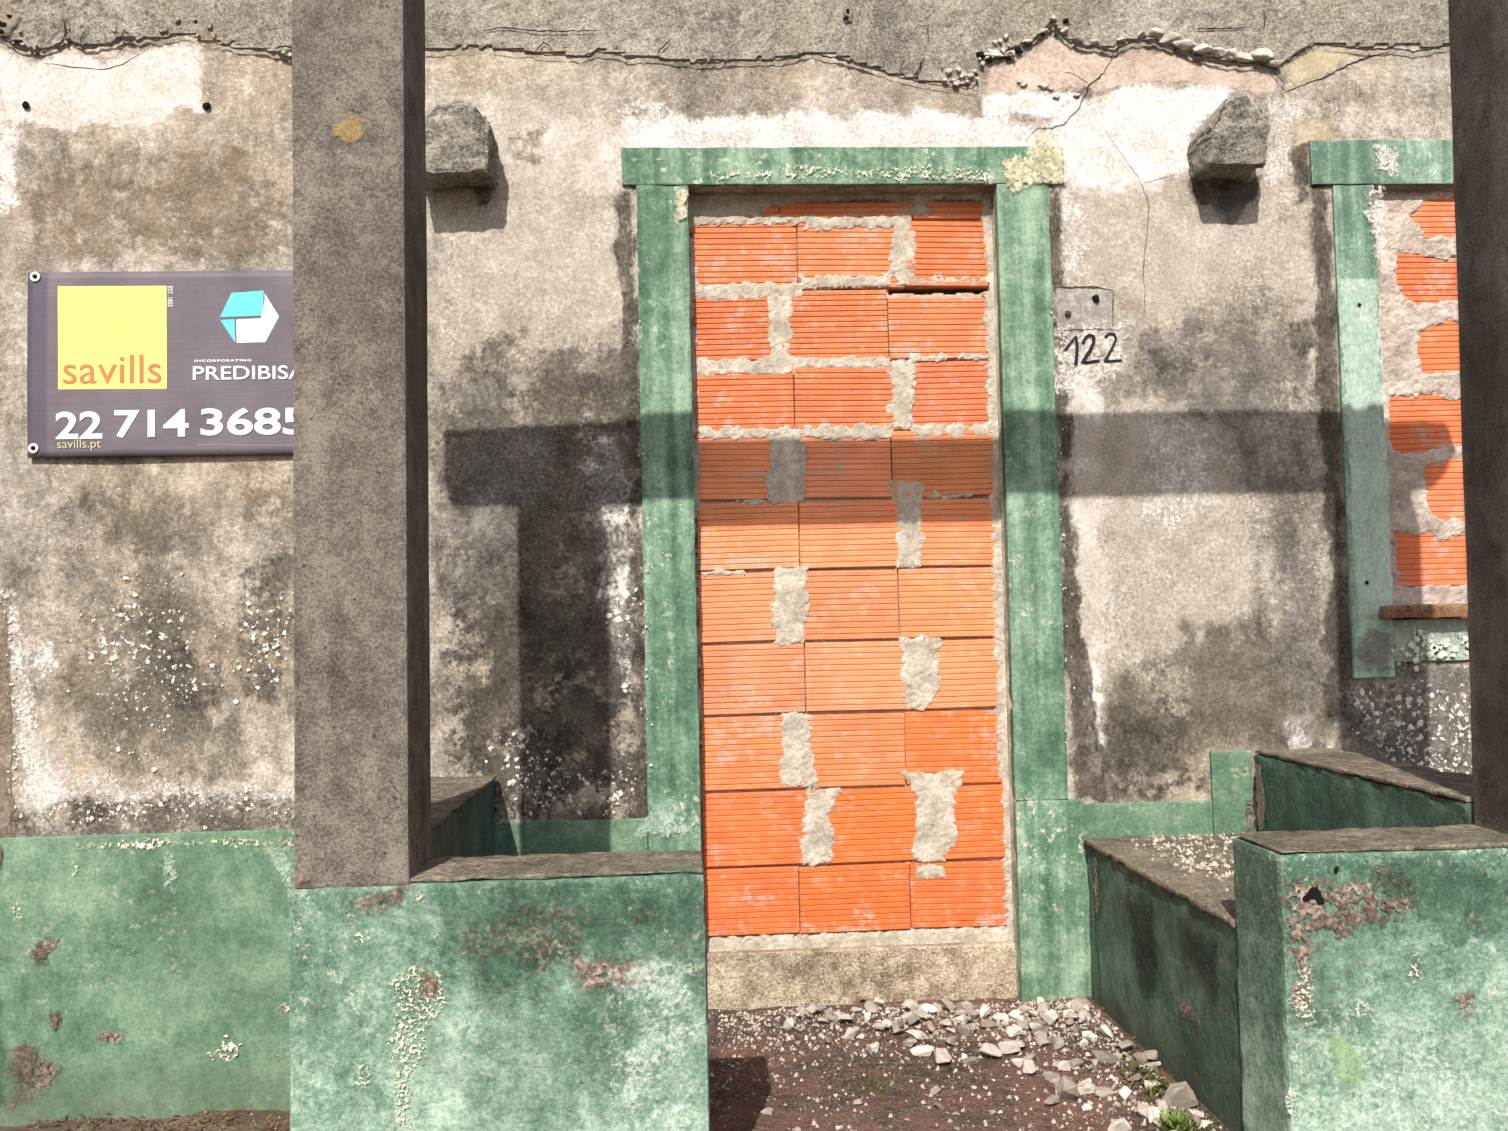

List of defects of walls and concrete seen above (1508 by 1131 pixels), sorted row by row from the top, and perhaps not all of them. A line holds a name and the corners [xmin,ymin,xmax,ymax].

crack [0,17,292,70]
leakage [25,141,293,261]
peeling [674,188,689,223]
crack [425,9,1450,312]
flaking render [712,35,1277,193]
leakage [430,48,1473,820]
leakage [77,484,186,556]
leakage [234,460,294,531]
leakage [0,555,295,890]
peeling [463,904,651,991]
peeling [1282,864,1418,1025]
peeling [5,1042,60,1108]